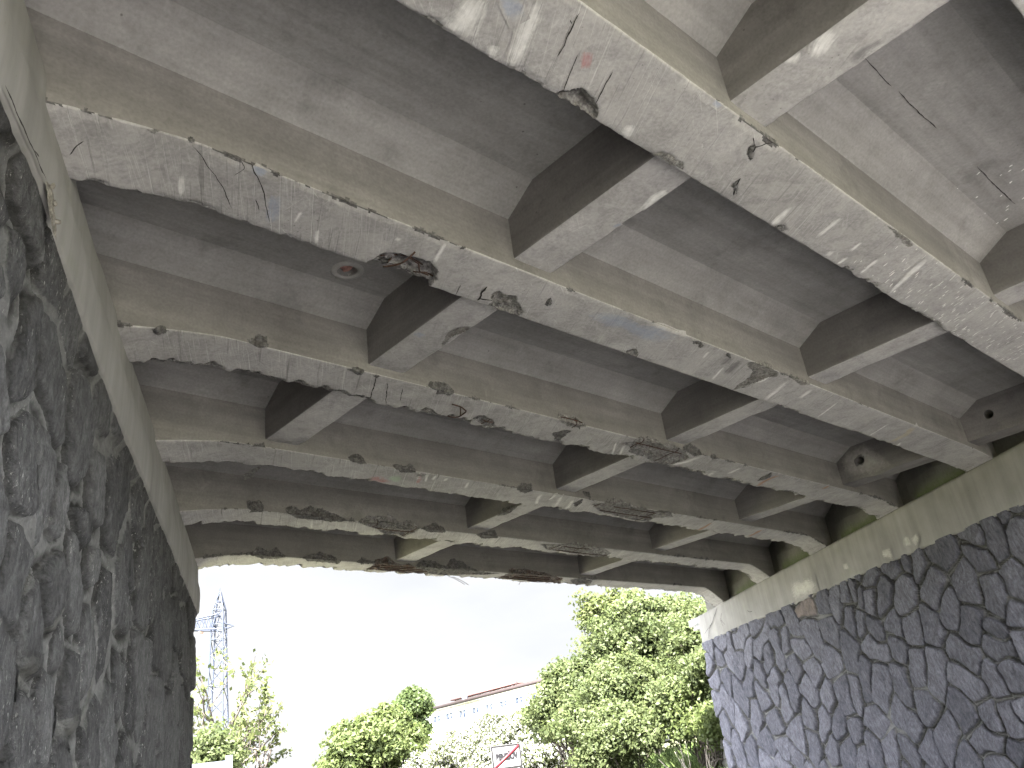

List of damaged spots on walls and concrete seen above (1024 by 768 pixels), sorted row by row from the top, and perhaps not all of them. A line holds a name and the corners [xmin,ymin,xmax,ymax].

crack [558,14,579,89]
spalling [557,88,599,119]
crack [867,60,935,127]
crack [6,88,46,178]
crack [197,151,270,222]
spalling [369,251,439,286]
spalling [490,291,523,316]
spalling [734,361,779,390]
spalling [622,436,702,465]
spalling [286,505,446,537]
spalling [541,540,611,557]
spalling [357,556,592,587]